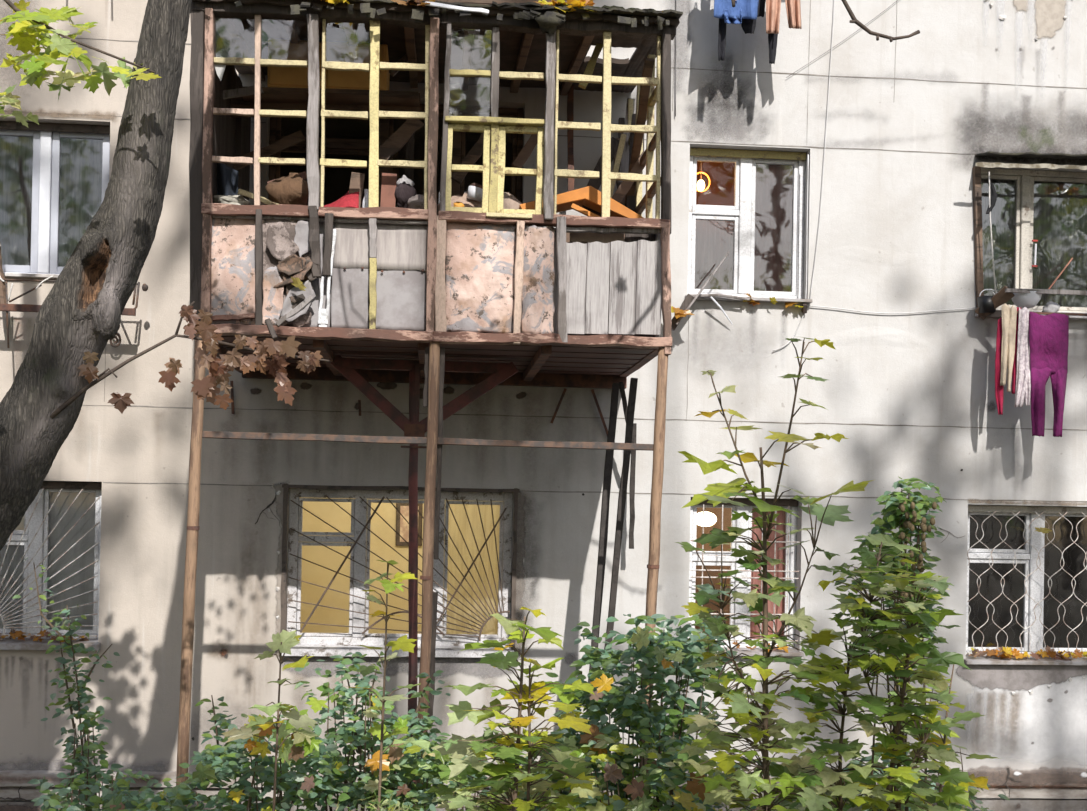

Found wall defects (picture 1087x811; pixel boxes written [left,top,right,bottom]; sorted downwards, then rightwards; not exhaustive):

peeling [984,0,1071,66]
water stain [975,126,1087,164]